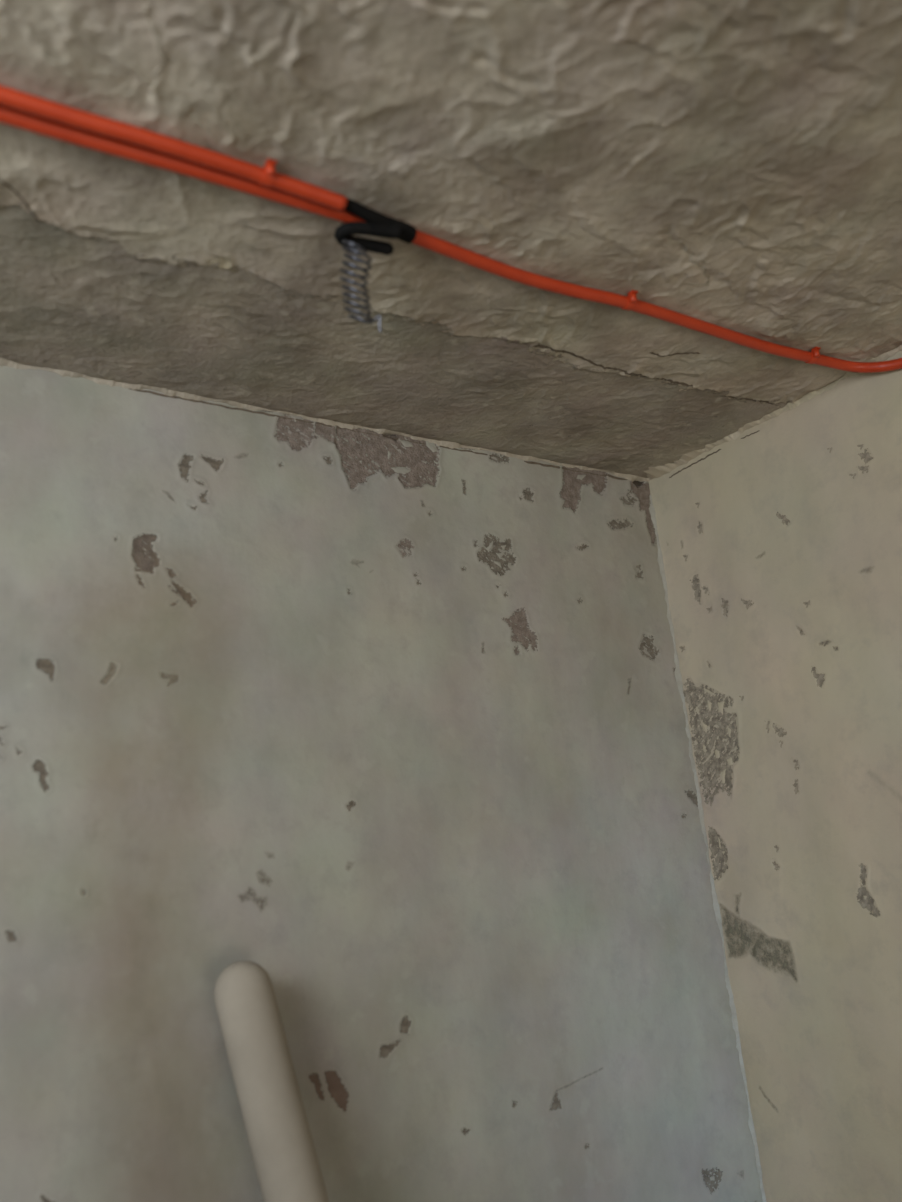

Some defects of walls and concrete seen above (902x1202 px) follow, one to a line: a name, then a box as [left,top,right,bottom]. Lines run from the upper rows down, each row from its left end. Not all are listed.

peeling [0,203,791,544]
crack [533,344,700,387]
crack [669,396,783,478]
flaking render [132,534,197,607]
flaking render [474,534,516,597]
flaking render [503,607,538,655]
flaking render [674,668,744,818]
flaking render [857,863,880,917]